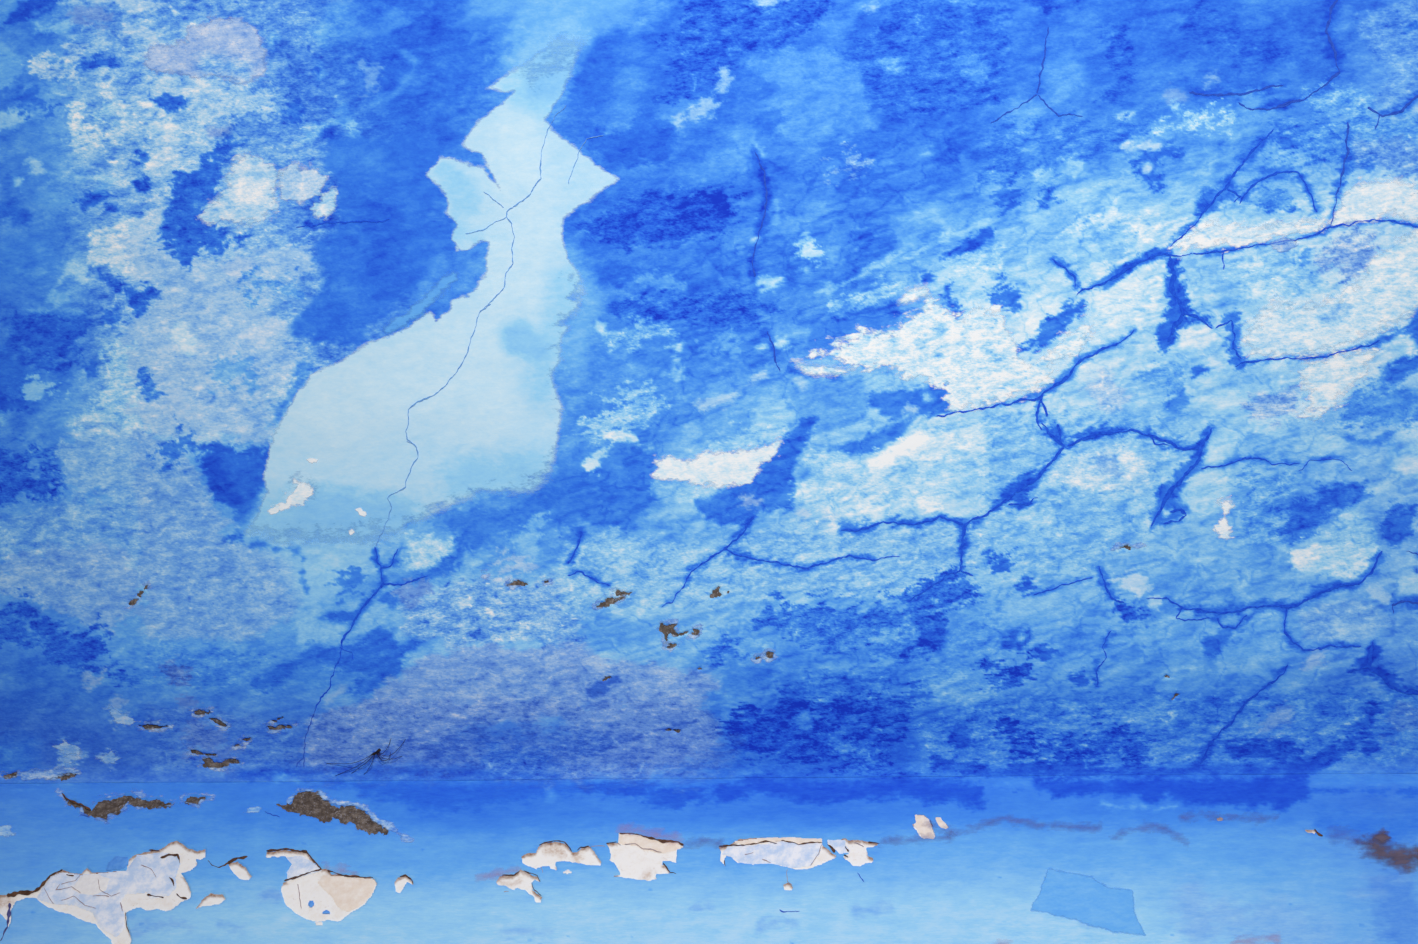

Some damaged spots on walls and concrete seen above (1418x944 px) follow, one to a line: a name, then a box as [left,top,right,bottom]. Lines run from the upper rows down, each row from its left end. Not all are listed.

crack [991,28,1080,123]
crack [1053,0,1418,366]
crack [296,105,603,767]
crack [662,330,1352,607]
crack [568,531,610,586]
crack [1034,551,1418,764]
spalling [0,766,215,824]
spalling [276,788,414,842]
spalling [0,841,252,944]
spalling [266,848,377,925]
spalling [496,833,684,903]
spalling [719,837,879,890]